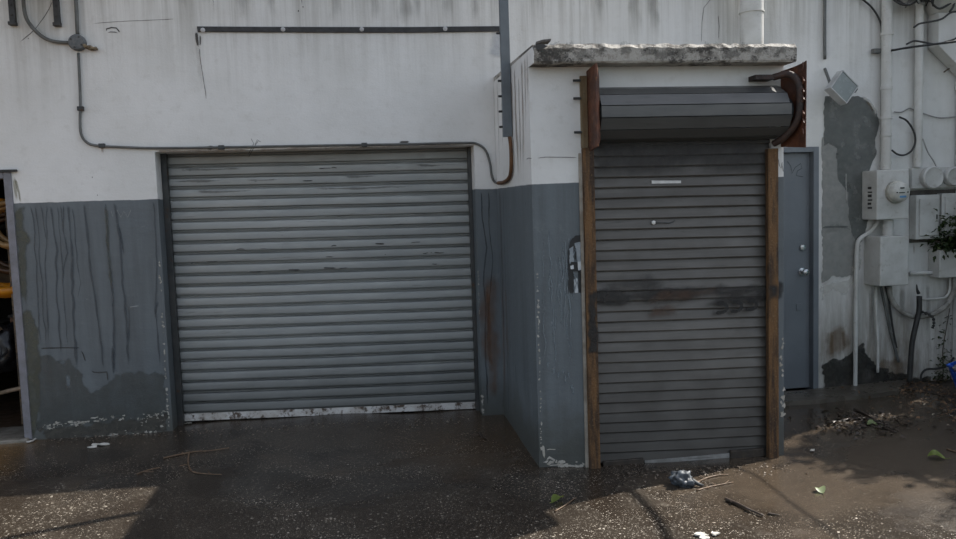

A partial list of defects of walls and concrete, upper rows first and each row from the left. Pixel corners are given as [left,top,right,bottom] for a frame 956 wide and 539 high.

spalling [535,39,551,51]
leakage [31,206,164,429]